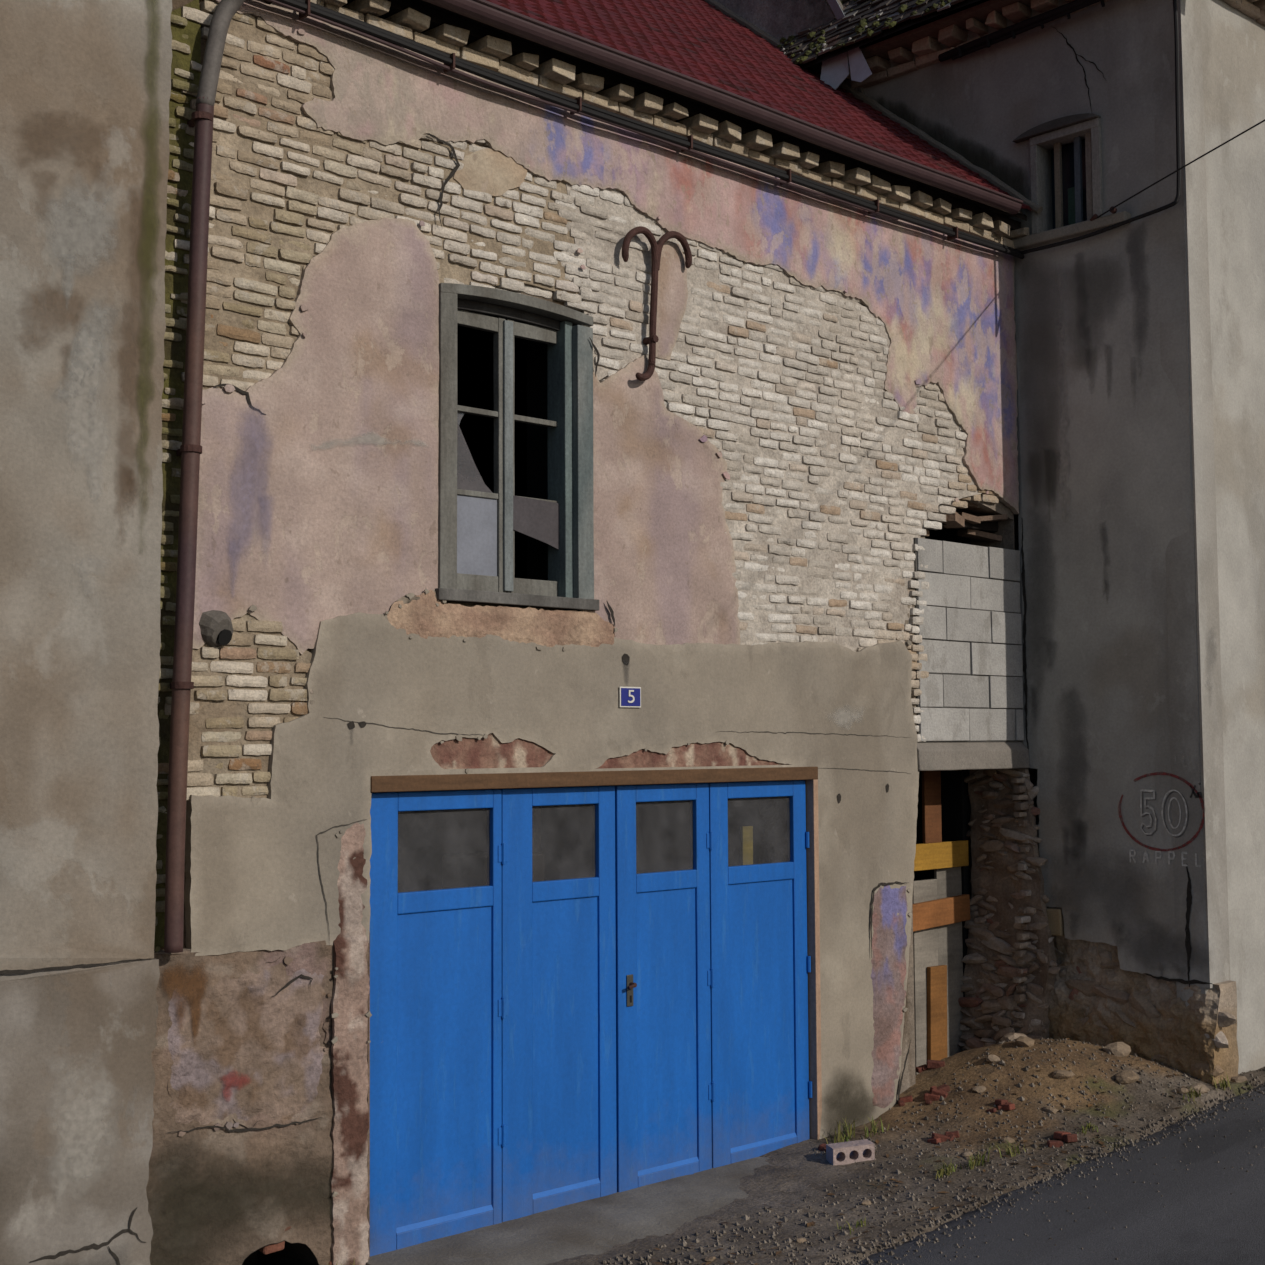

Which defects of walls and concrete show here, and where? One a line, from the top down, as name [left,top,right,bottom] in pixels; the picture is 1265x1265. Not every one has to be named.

crack [1053,27,1106,111]
flaking render [202,13,1008,744]
flaking render [154,0,221,952]
flaking render [187,605,315,804]
spalling [430,733,554,773]
spalling [595,740,790,769]
crack [1146,866,1213,987]
spalling [167,823,372,1265]
crack [30,1208,146,1265]